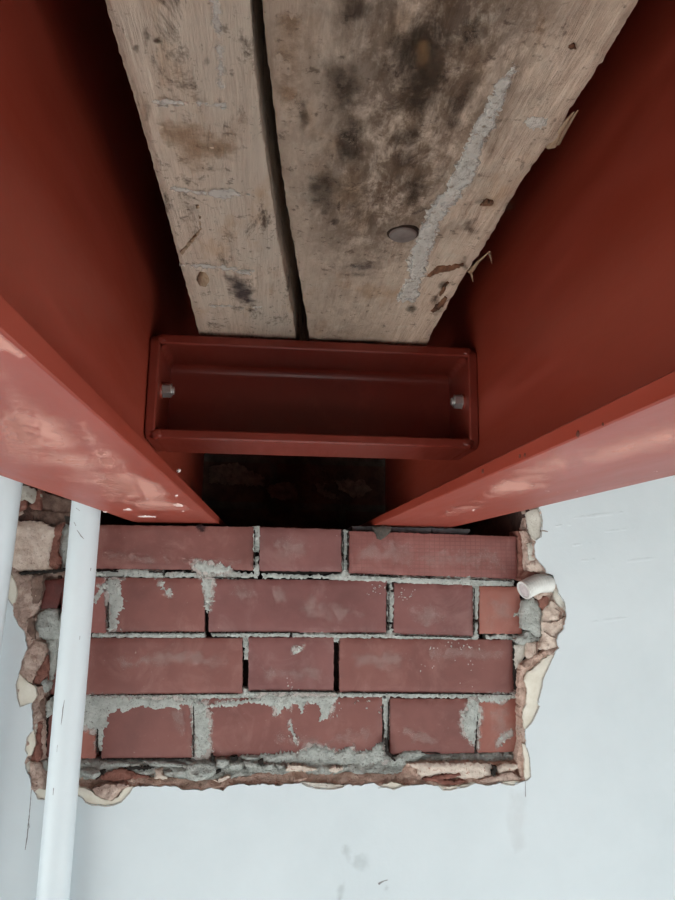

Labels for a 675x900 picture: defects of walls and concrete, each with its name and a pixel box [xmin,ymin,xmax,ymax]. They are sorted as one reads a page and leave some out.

leakage [337,132,358,159]
leakage [345,1,365,19]
leakage [394,28,442,109]
leakage [396,62,520,303]
flaking render [8,486,72,800]
flaking render [78,507,566,807]